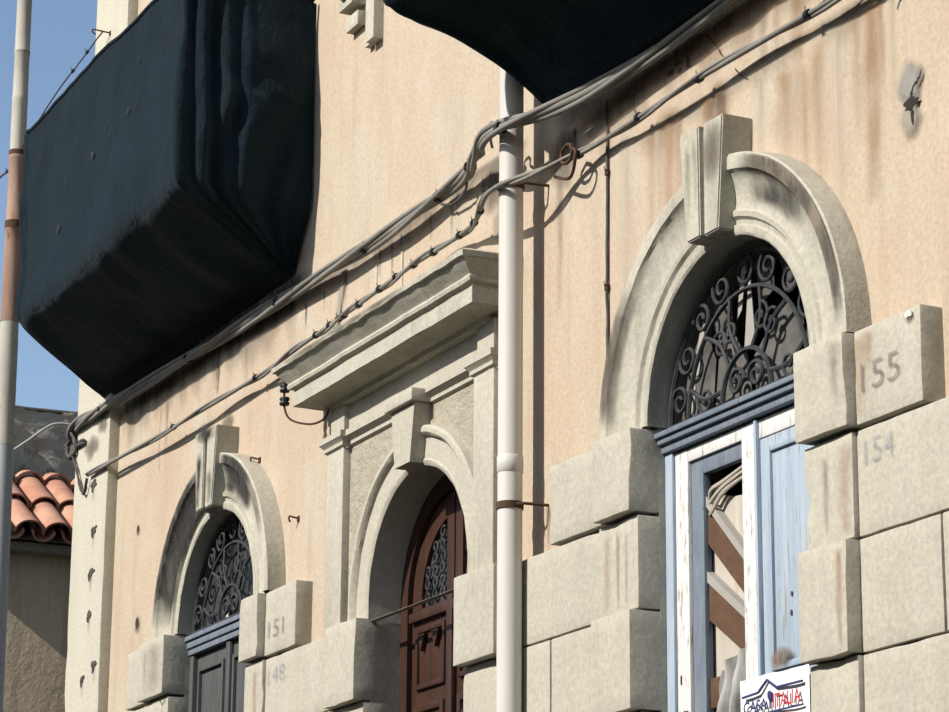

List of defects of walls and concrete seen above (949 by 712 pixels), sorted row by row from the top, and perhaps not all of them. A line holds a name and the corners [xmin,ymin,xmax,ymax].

spalling [898,63,921,135]
leakage [222,454,256,514]
leakage [154,459,209,610]